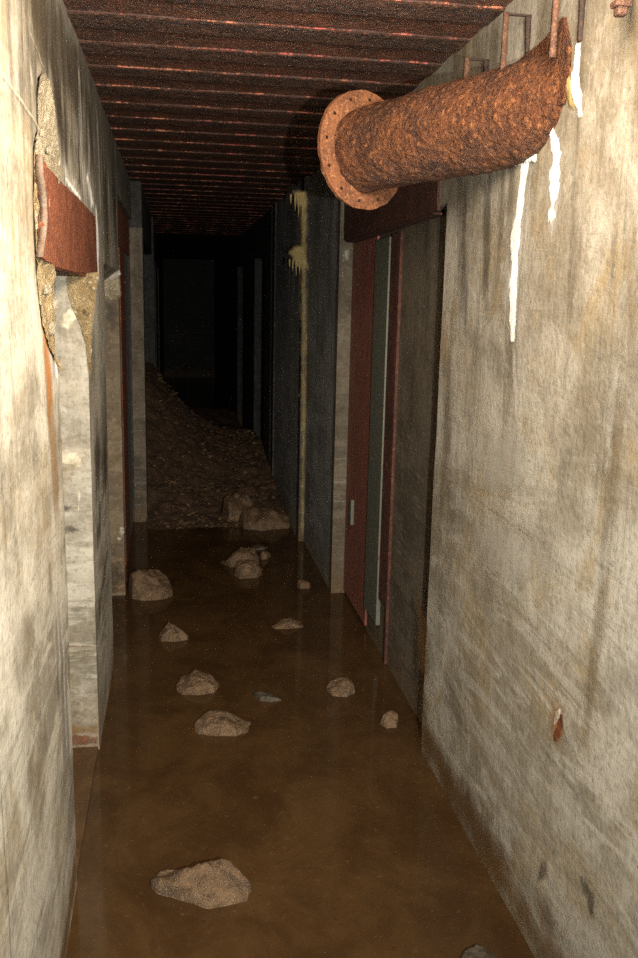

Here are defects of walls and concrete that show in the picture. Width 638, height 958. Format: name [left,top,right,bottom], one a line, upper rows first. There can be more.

leakage [566,43,582,117]
spalling [33,73,121,372]
leakage [508,154,536,342]
leakage [548,128,561,223]
rust [43,332,52,416]